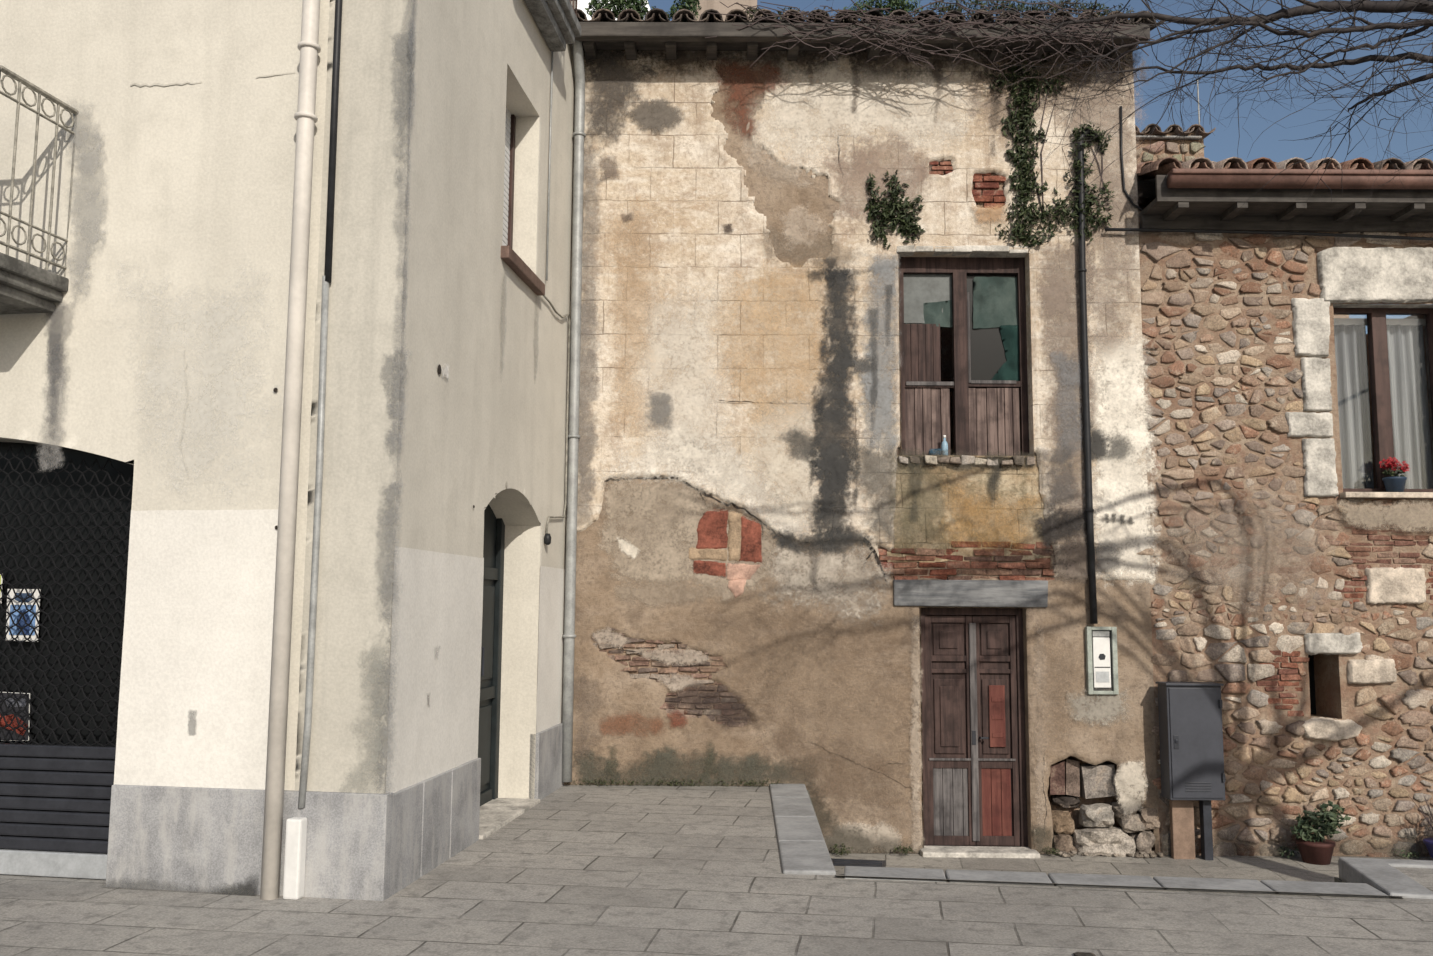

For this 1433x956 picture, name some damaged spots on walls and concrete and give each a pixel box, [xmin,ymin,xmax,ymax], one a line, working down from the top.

water stain [394,20,415,122]
peeling [826,138,953,217]
water stain [48,331,65,395]
spalling [878,72,1141,583]
water stain [771,255,900,583]
water stain [1036,353,1130,572]
peeling [617,538,639,558]
spalling [689,509,762,598]
spalling [591,627,750,727]